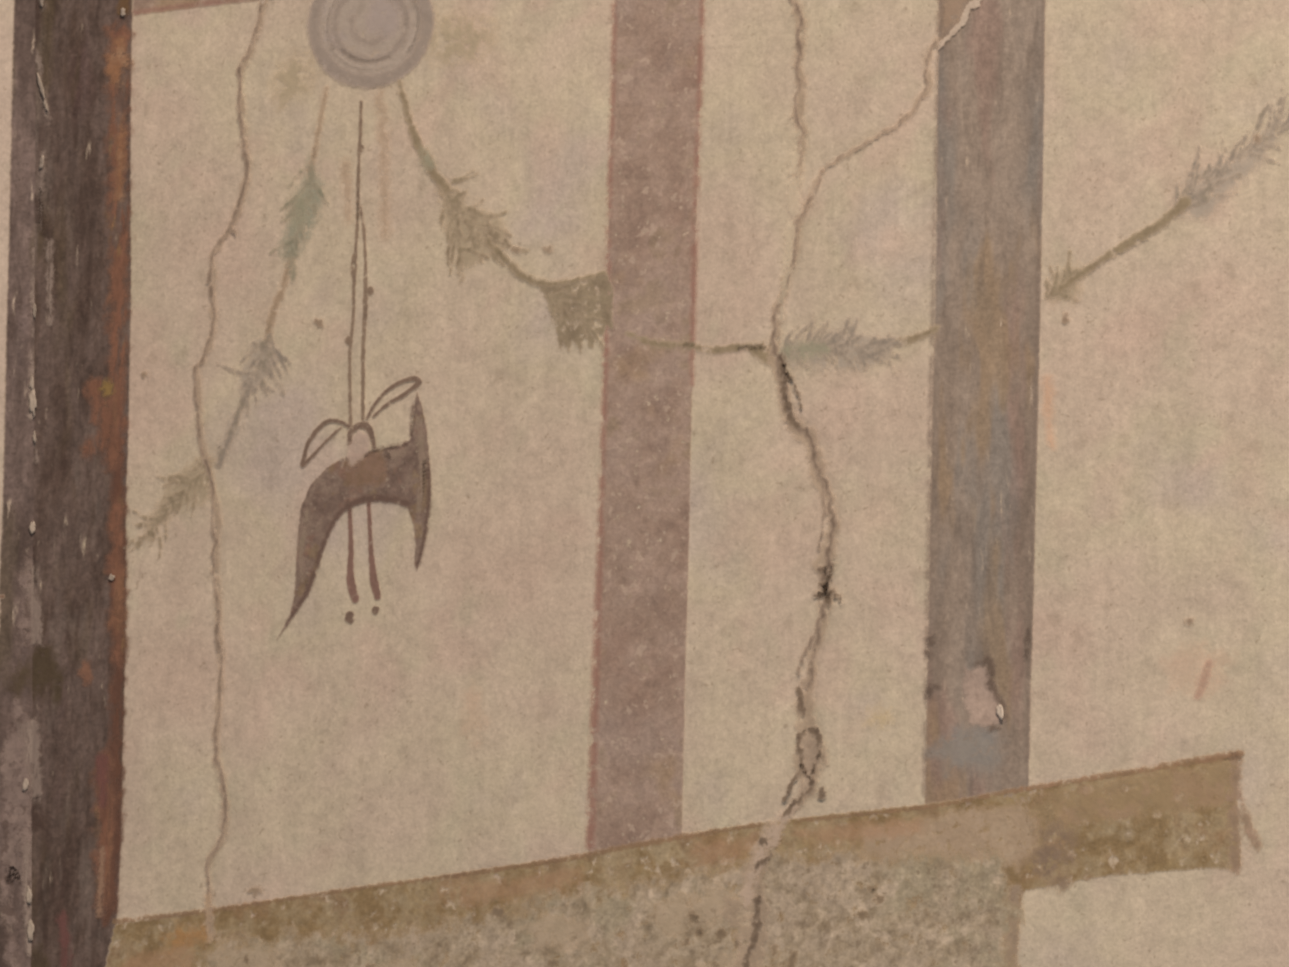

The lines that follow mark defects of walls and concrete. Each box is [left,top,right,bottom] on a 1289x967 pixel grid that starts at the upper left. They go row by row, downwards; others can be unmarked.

crack [193,0,266,937]
crack [723,0,980,967]
spalling [963,656,1007,731]